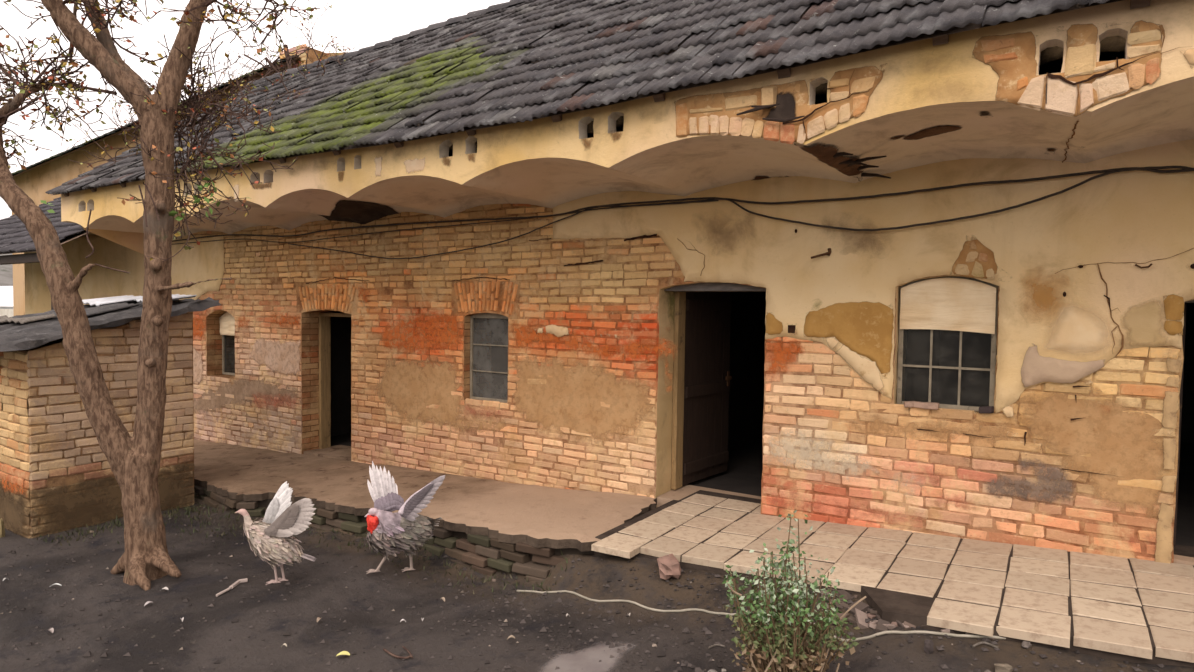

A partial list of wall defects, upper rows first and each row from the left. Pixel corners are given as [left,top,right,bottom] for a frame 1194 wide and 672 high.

spalling [674,64,891,179]
spalling [891,125,962,140]
spalling [972,20,1163,117]
flaking render [193,200,684,498]
spalling [952,239,997,280]
crack [1055,248,1194,356]
flaking render [762,294,1184,561]
damp [987,460,1073,503]